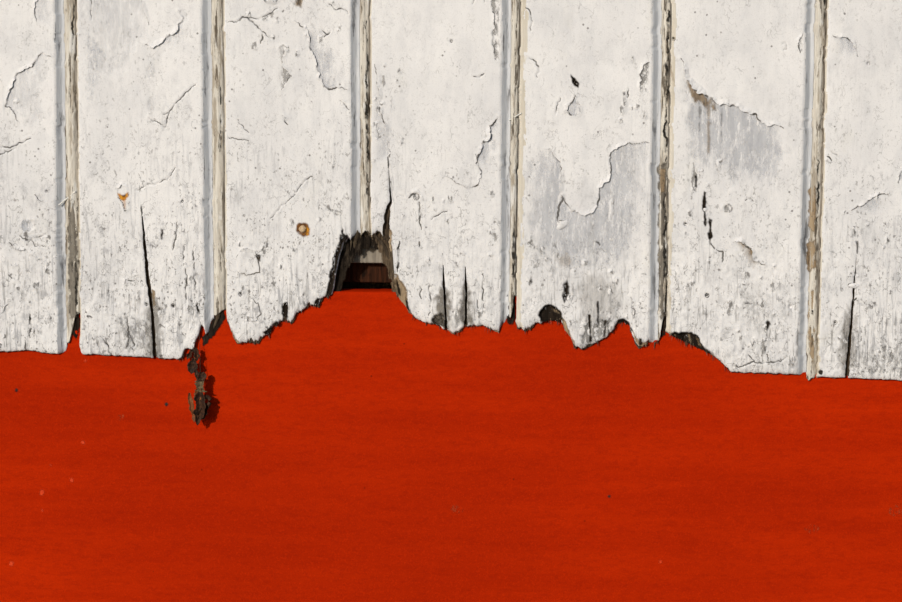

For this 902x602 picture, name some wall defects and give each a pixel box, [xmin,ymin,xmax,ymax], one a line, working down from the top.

leakage [689,83,715,109]
peeling [556,141,648,218]
crack [97,168,175,357]